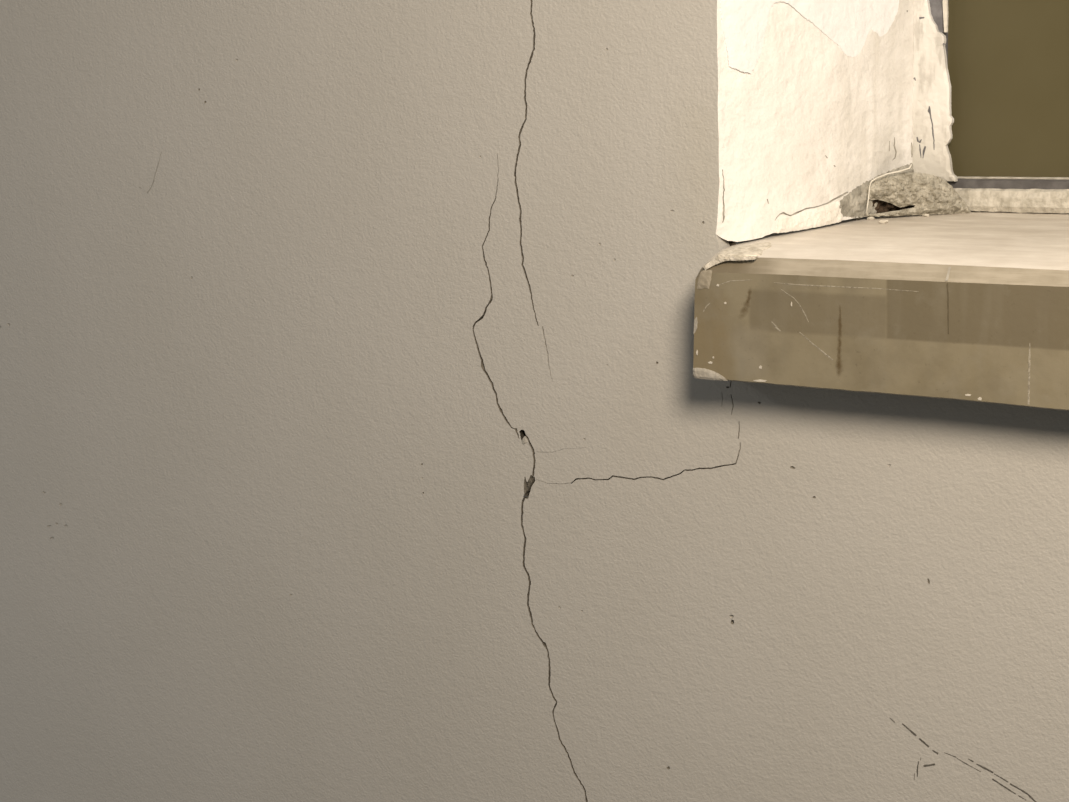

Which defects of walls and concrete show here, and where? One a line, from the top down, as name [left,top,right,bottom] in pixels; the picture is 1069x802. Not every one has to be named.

peeling [720,0,899,74]
spalling [776,106,971,233]
crack [473,0,741,802]